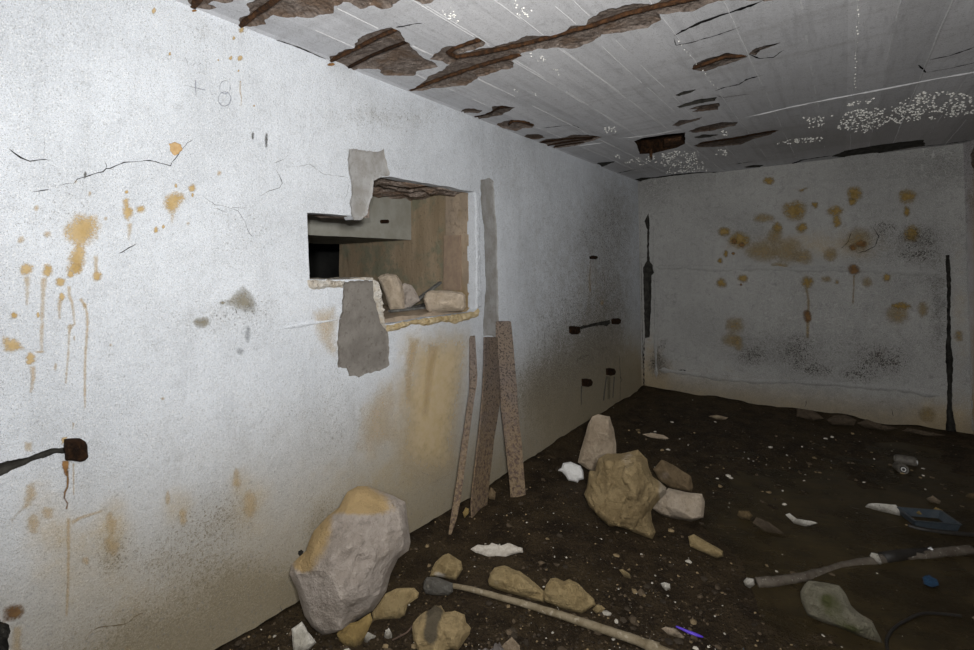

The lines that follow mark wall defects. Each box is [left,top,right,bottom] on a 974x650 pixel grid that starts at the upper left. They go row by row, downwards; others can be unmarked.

spalling [188,0,233,10]
spalling [238,0,400,28]
spalling [329,0,724,91]
crack [11,132,54,162]
spalling [461,106,601,148]
spalling [672,89,778,147]
corrosion [123,191,144,219]
crack [34,141,252,236]
corrosion [165,184,195,216]
corrosion [756,189,818,232]
corrosion [21,215,98,300]
corrosion [3,338,35,364]